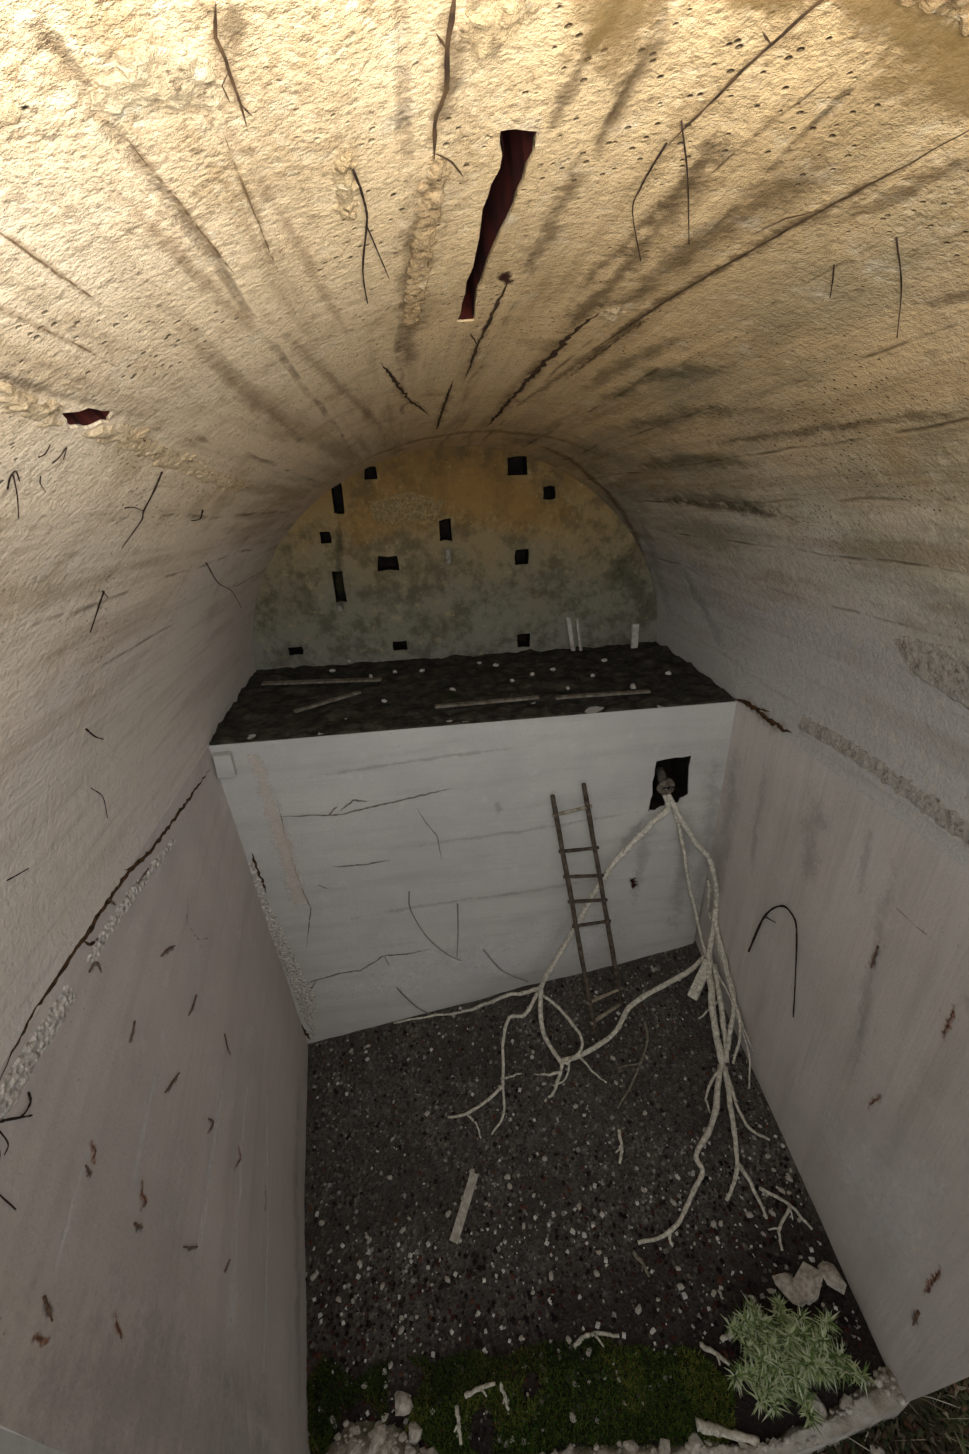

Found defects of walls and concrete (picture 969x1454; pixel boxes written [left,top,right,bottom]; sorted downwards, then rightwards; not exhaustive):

crack [433,0,463,177]
leakage [578,0,659,70]
crack [668,0,824,145]
leakage [839,0,969,116]
crack [486,130,969,427]
spalling [0,381,250,493]
crack [736,699,792,733]
spalling [893,636,969,710]
spalling [797,715,969,848]
crack [0,771,209,1080]
corrosion [32,1295,53,1345]
corrosion [912,1272,941,1326]